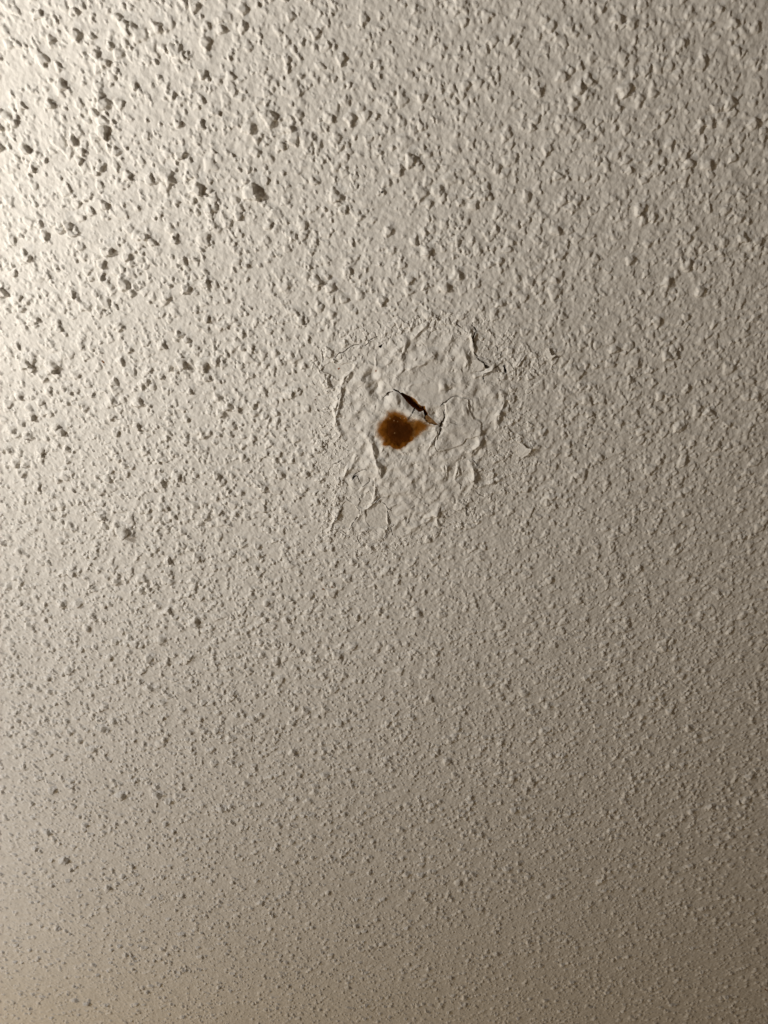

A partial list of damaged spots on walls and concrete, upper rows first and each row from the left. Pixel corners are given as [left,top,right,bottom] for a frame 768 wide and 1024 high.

crack [456,322,502,382]
crack [382,388,484,516]